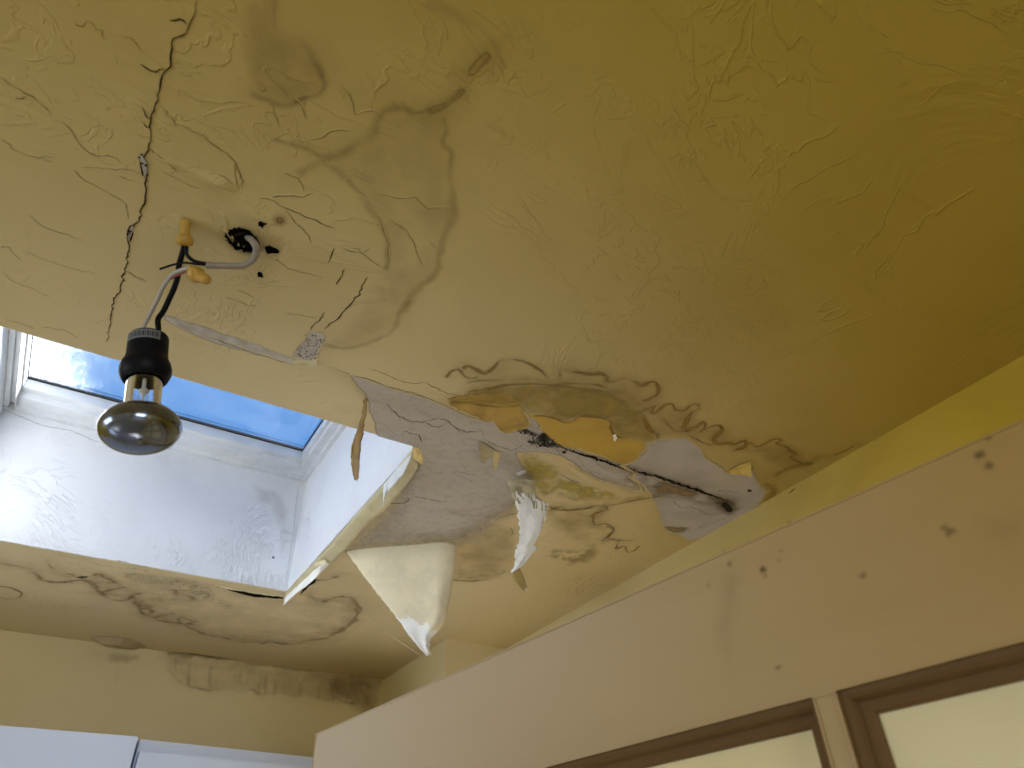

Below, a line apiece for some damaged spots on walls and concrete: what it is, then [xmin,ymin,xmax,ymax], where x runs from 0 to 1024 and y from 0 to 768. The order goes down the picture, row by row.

crack [0,0,450,342]
peeling [165,316,326,367]
damp [445,362,535,401]
damp [518,429,566,454]
crack [325,364,795,515]
damp [550,372,811,467]
crack [216,486,316,600]
peeling [283,374,768,656]
damp [525,462,639,552]
damp [37,574,231,634]